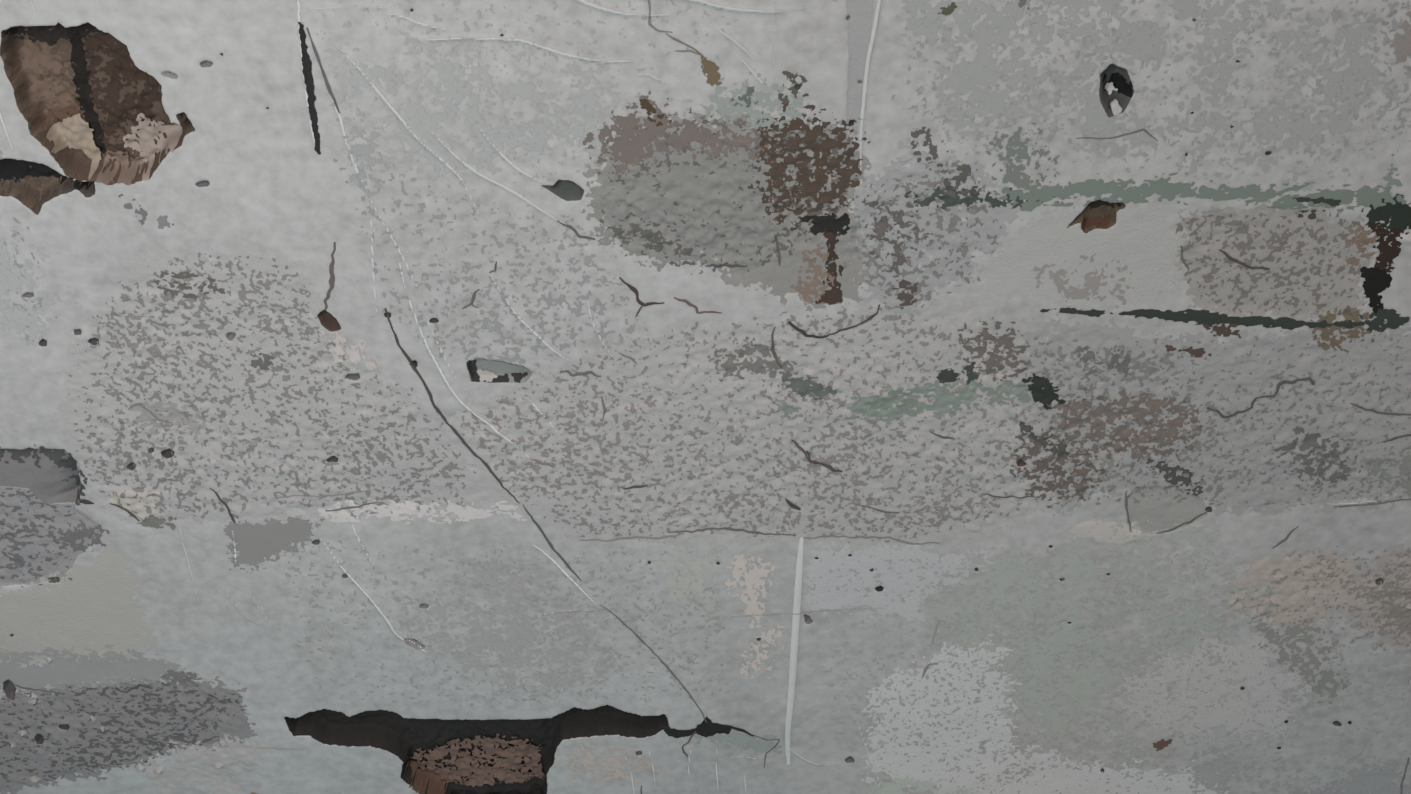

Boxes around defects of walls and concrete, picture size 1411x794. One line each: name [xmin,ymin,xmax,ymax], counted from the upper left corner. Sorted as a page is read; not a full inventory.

spalling [0,22,195,215]
crack [298,22,340,155]
rust [582,91,870,231]
water stain [321,0,1411,309]
crack [324,242,336,311]
crack [462,261,497,309]
crack [558,221,595,240]
flaking render [54,0,1411,548]
rust [790,243,843,305]
water stain [1033,253,1410,334]
spalling [284,705,669,794]